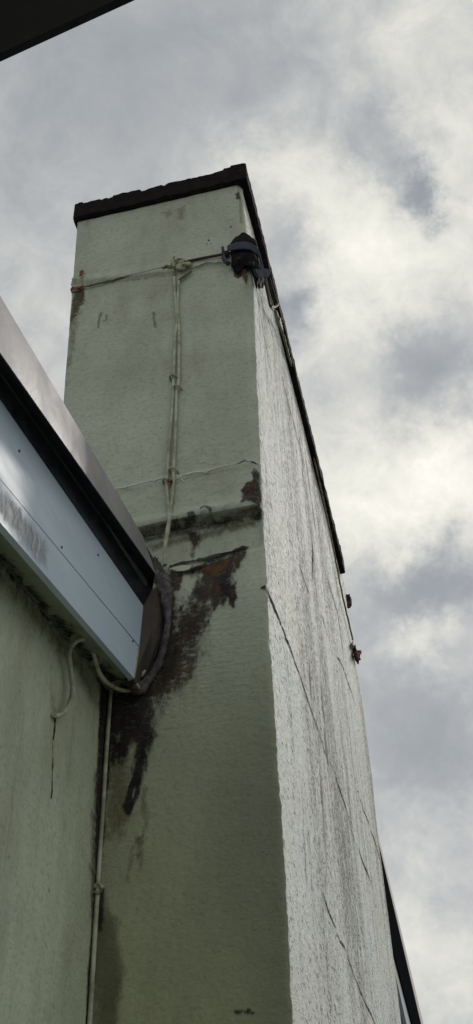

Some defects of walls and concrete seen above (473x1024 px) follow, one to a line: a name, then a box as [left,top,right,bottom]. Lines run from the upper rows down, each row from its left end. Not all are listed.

leakage [141,502,271,541]
leakage [0,553,185,1024]
crack [261,585,380,885]
crack [323,893,375,1023]